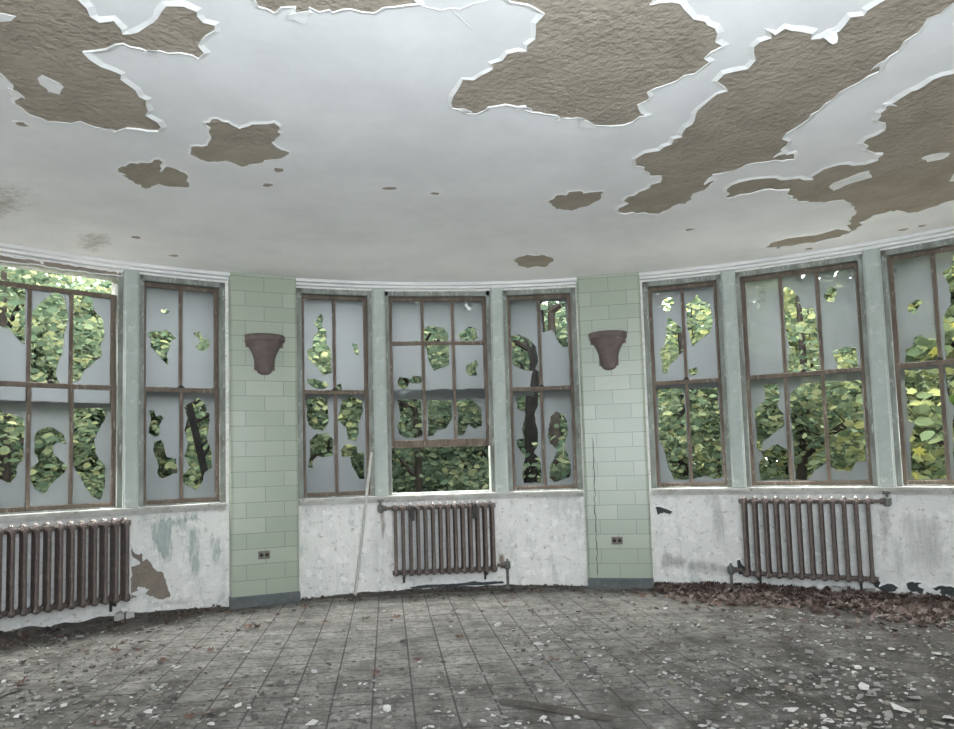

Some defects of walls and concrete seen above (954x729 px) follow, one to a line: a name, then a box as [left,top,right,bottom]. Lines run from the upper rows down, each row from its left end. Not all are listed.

peeling [249,0,425,25]
peeling [0,0,221,133]
peeling [116,157,192,189]
peeling [187,117,292,187]
peeling [447,0,954,250]
peeling [512,254,556,268]
flaking render [128,543,173,603]